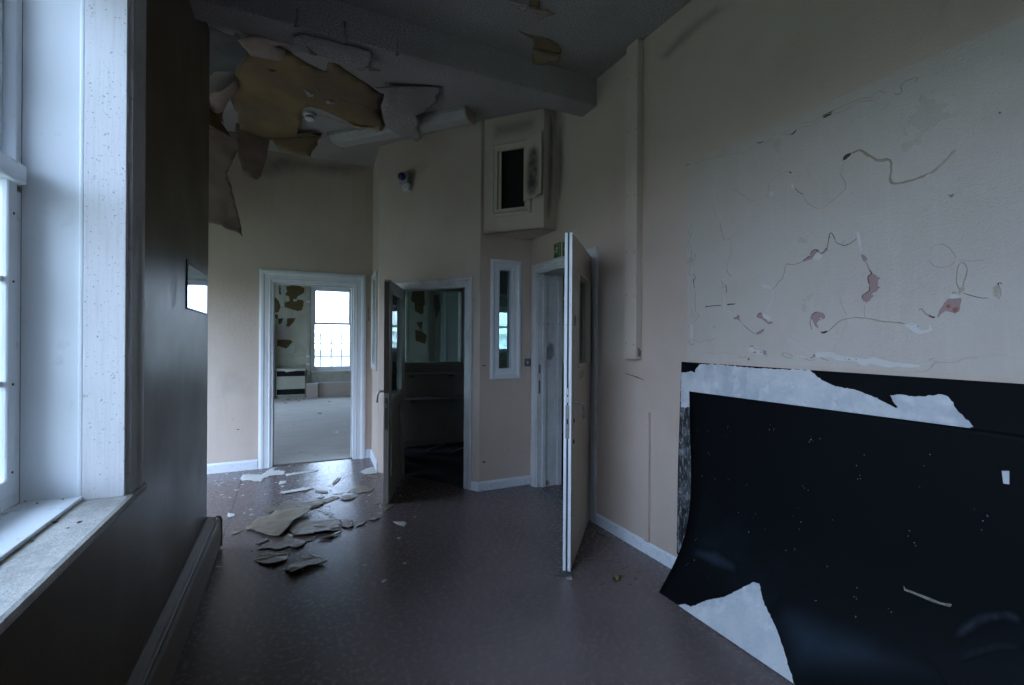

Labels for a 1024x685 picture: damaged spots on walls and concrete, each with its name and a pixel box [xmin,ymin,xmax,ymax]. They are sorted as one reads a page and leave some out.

water stain [489,111,566,223]
peeling [810,231,905,334]
peeling [929,262,980,318]